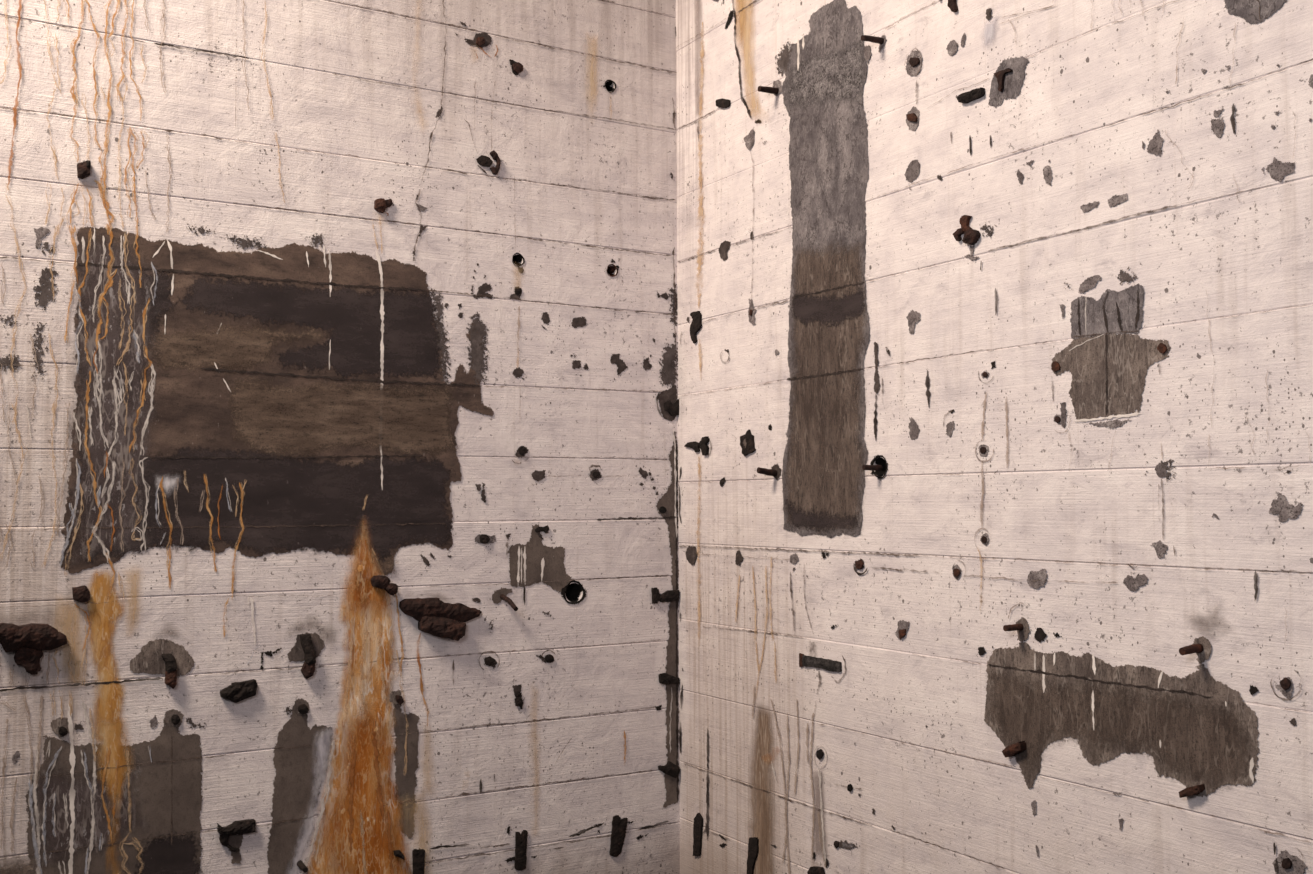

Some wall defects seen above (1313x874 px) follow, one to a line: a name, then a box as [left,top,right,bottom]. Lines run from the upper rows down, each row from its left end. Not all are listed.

corrosion [0,0,22,185]
crack [0,0,757,315]
crack [475,156,935,321]
crack [989,206,1176,251]
crack [1066,59,1313,137]
water stain [0,234,156,567]
corrosion [45,0,152,801]
crack [765,341,1047,384]
peeling [1051,267,1171,429]
corrosion [155,474,247,637]
water stain [0,638,142,874]
corrosion [290,537,429,874]